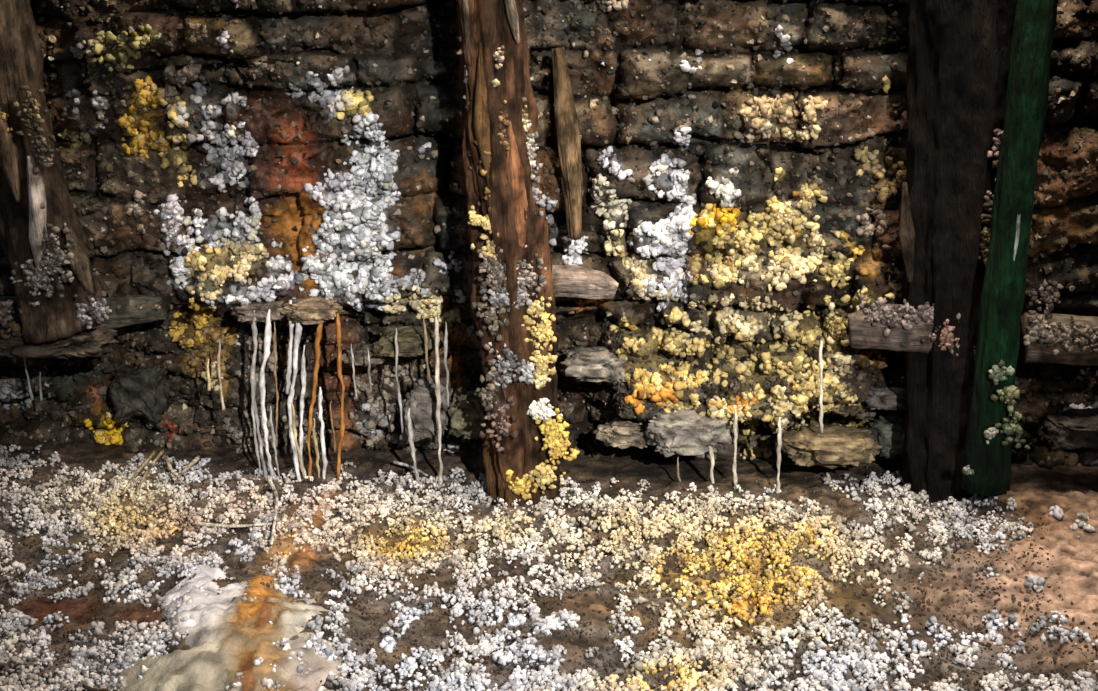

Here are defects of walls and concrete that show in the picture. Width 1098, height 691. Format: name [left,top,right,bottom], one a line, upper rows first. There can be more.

rust [239,85,324,299]